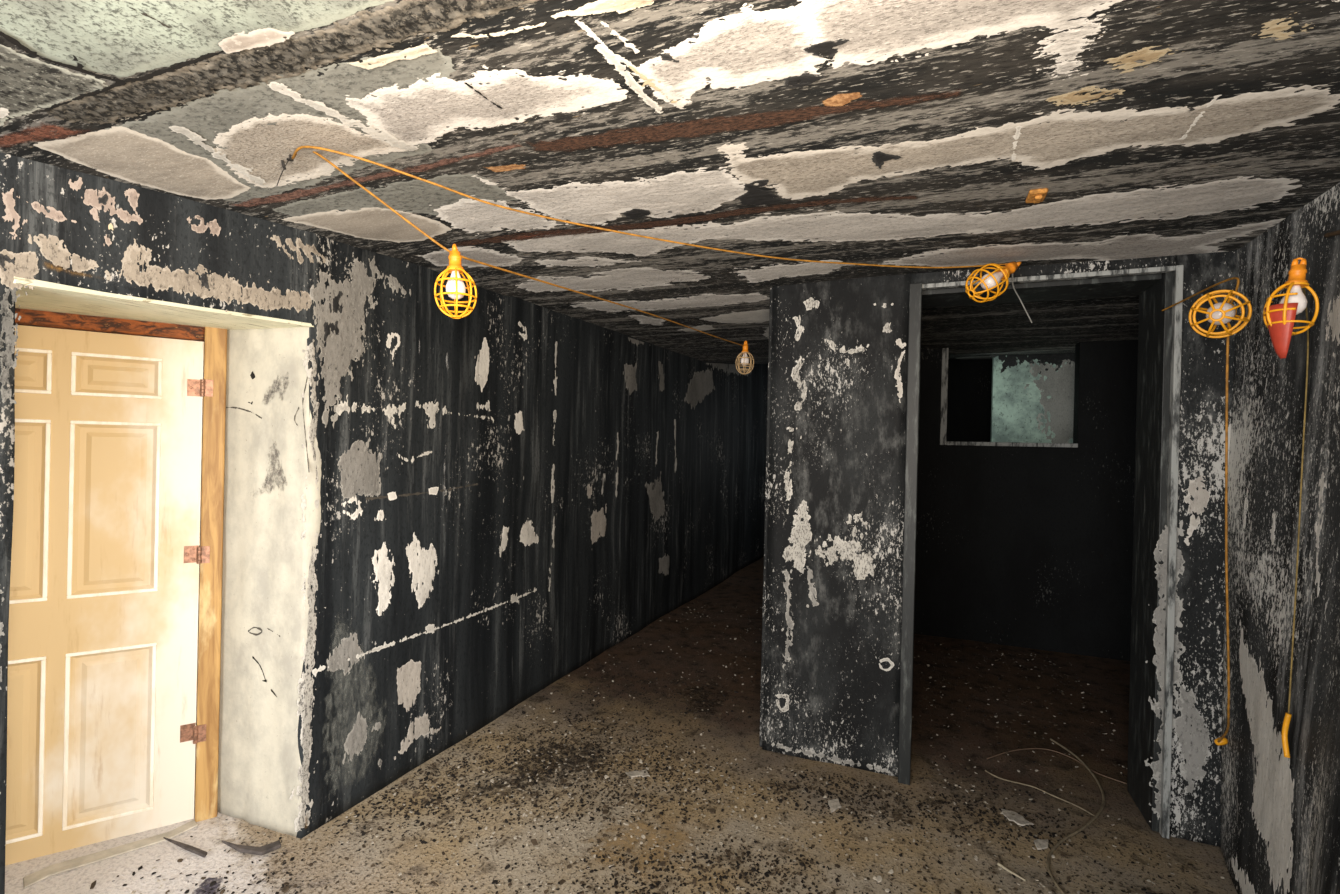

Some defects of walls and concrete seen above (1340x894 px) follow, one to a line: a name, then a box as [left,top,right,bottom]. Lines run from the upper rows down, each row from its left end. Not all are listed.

rust [0,123,89,147]
rust [230,89,960,207]
peeling [0,0,1340,338]
peeling [475,337,490,392]
peeling [791,297,820,410]
peeling [874,303,906,403]
peeling [0,188,411,832]
peeling [370,532,439,616]
peeling [781,427,879,669]
peeling [1144,475,1214,822]
peeling [378,659,441,770]
peeling [1231,620,1295,894]